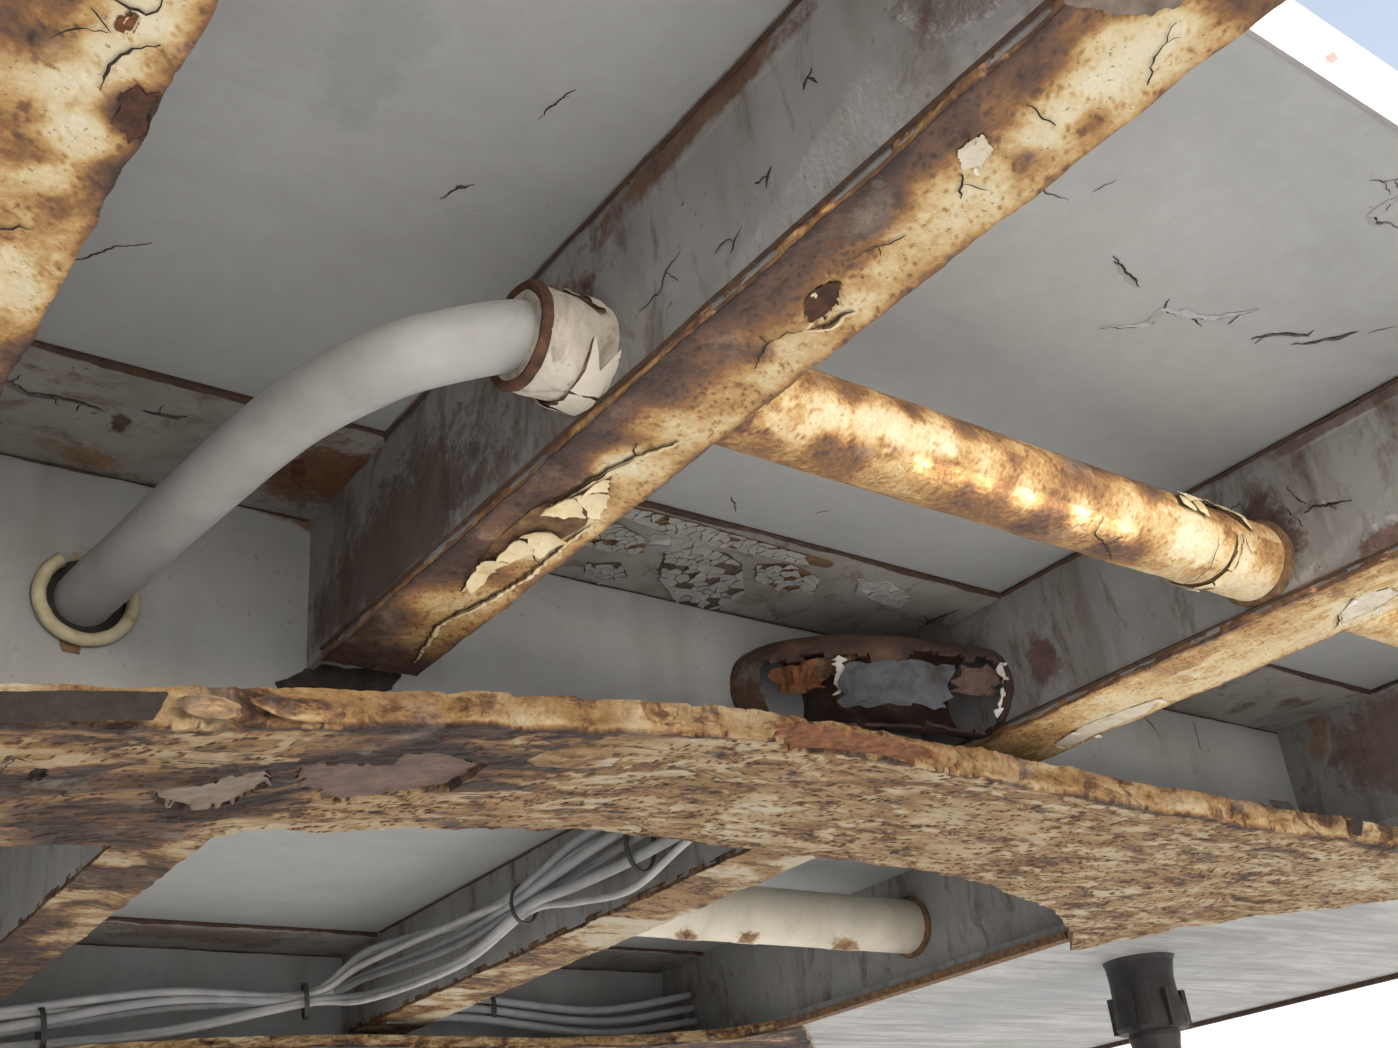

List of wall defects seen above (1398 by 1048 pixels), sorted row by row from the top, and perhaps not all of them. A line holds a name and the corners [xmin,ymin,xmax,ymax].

crack [48,0,163,91]
crack [538,90,575,121]
crack [75,243,152,261]
crack [1101,256,1393,346]
rust [176,0,834,722]
rust [1193,382,1398,594]
peeling [466,476,834,610]
peeling [768,655,857,695]
spalling [153,771,271,810]
spalling [295,753,478,800]
rust [1276,684,1398,819]
rust [730,920,765,945]